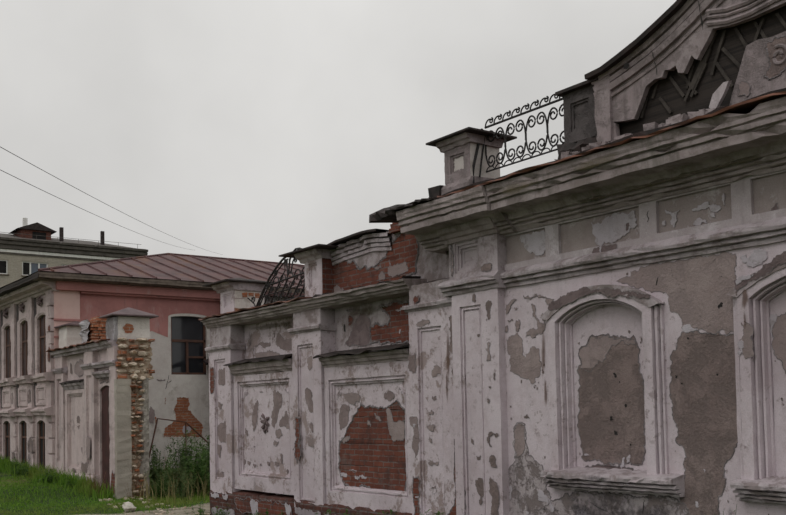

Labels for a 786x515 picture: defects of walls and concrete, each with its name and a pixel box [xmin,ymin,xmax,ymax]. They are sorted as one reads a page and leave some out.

spalling [640,12,786,118]
flaking render [333,232,419,292]
peeling [591,211,637,253]
flaking render [369,295,430,346]
spalling [99,323,204,497]
spalling [211,493,329,515]
peeling [244,387,314,473]
flaking render [338,391,435,515]
flaking render [447,439,466,515]
spalling [475,247,786,515]